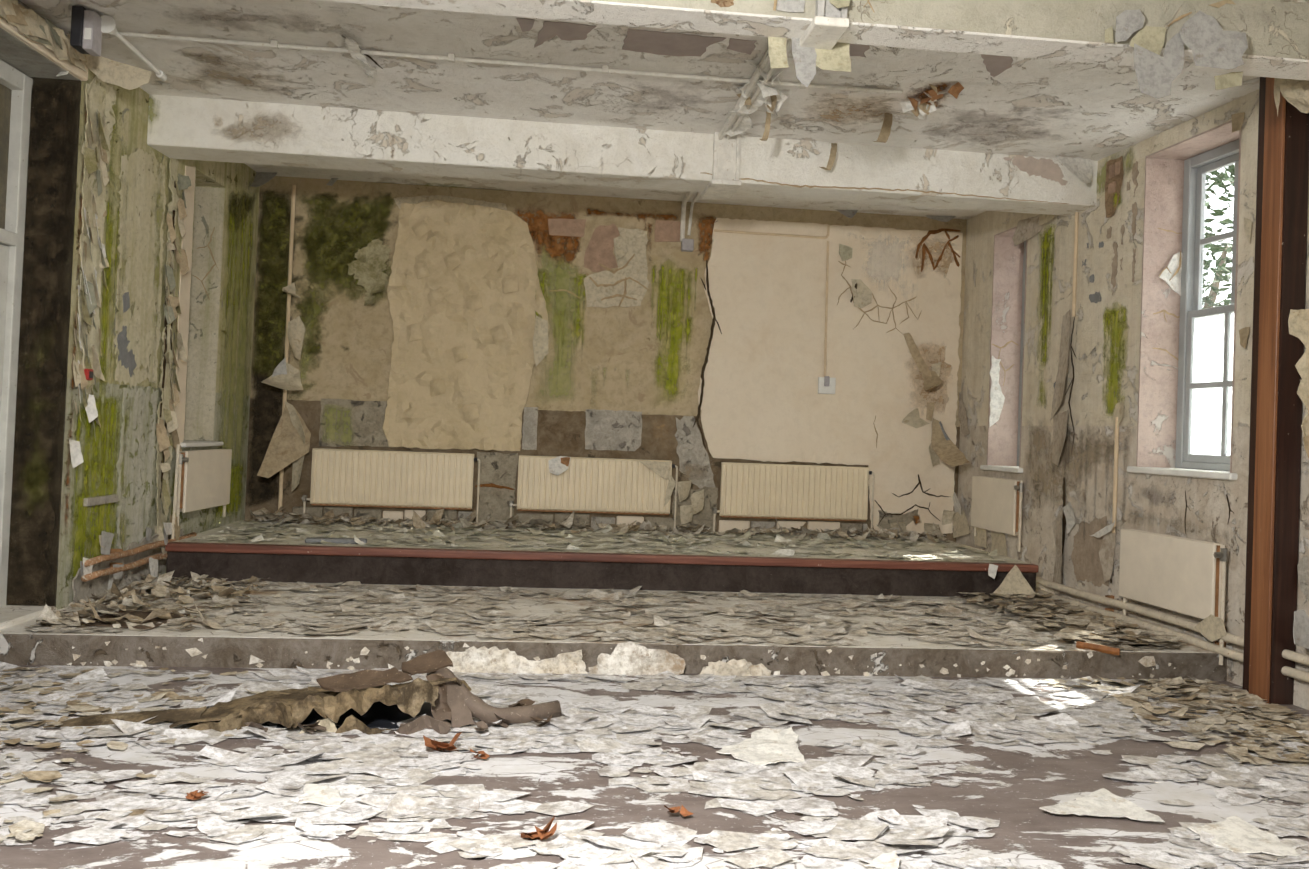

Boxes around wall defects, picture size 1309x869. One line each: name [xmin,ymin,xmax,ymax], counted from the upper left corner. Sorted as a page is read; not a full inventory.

peeling [516,18,597,48]
rust [900,82,964,120]
peeling [1105,0,1248,99]
rust [515,208,677,263]
crack [837,228,961,333]
water stain [1040,232,1054,335]
water stain [6,82,127,606]
water stain [226,192,394,506]
crack [693,260,722,448]
peeling [1288,309,1309,458]
flaking render [257,316,1037,599]
crack [875,474,949,523]